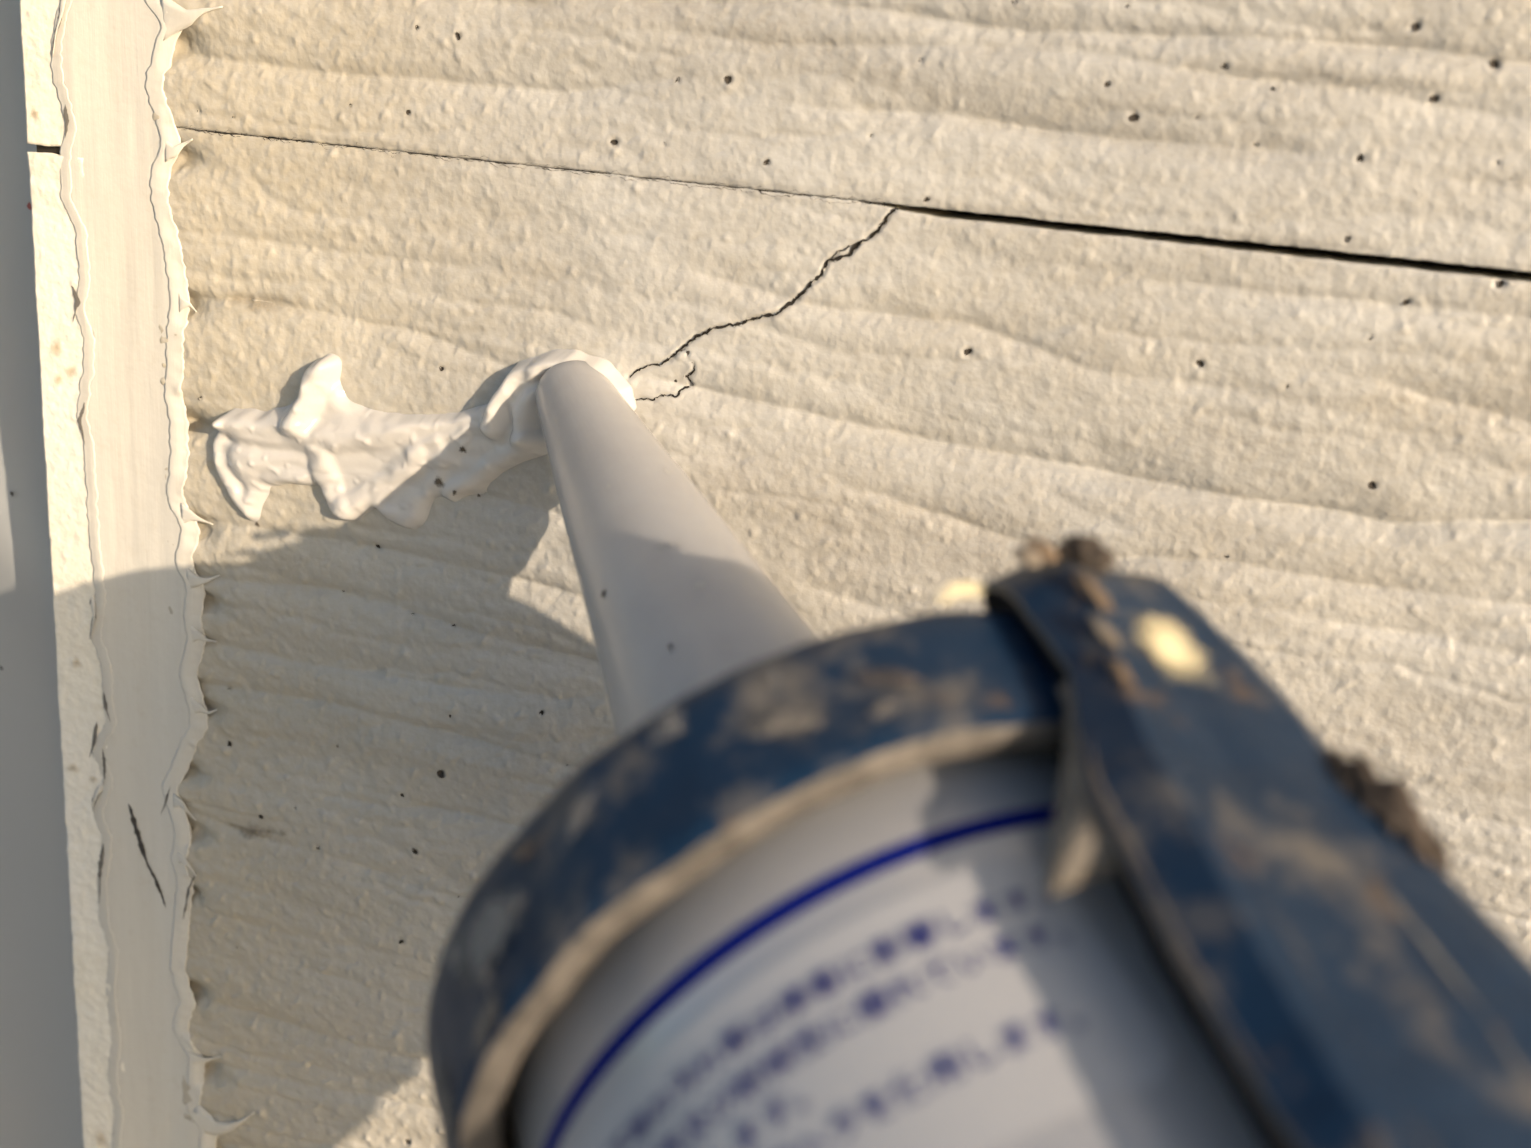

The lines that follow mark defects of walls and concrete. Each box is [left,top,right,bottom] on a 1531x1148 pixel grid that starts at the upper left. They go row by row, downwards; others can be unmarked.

crack [179,125,898,401]